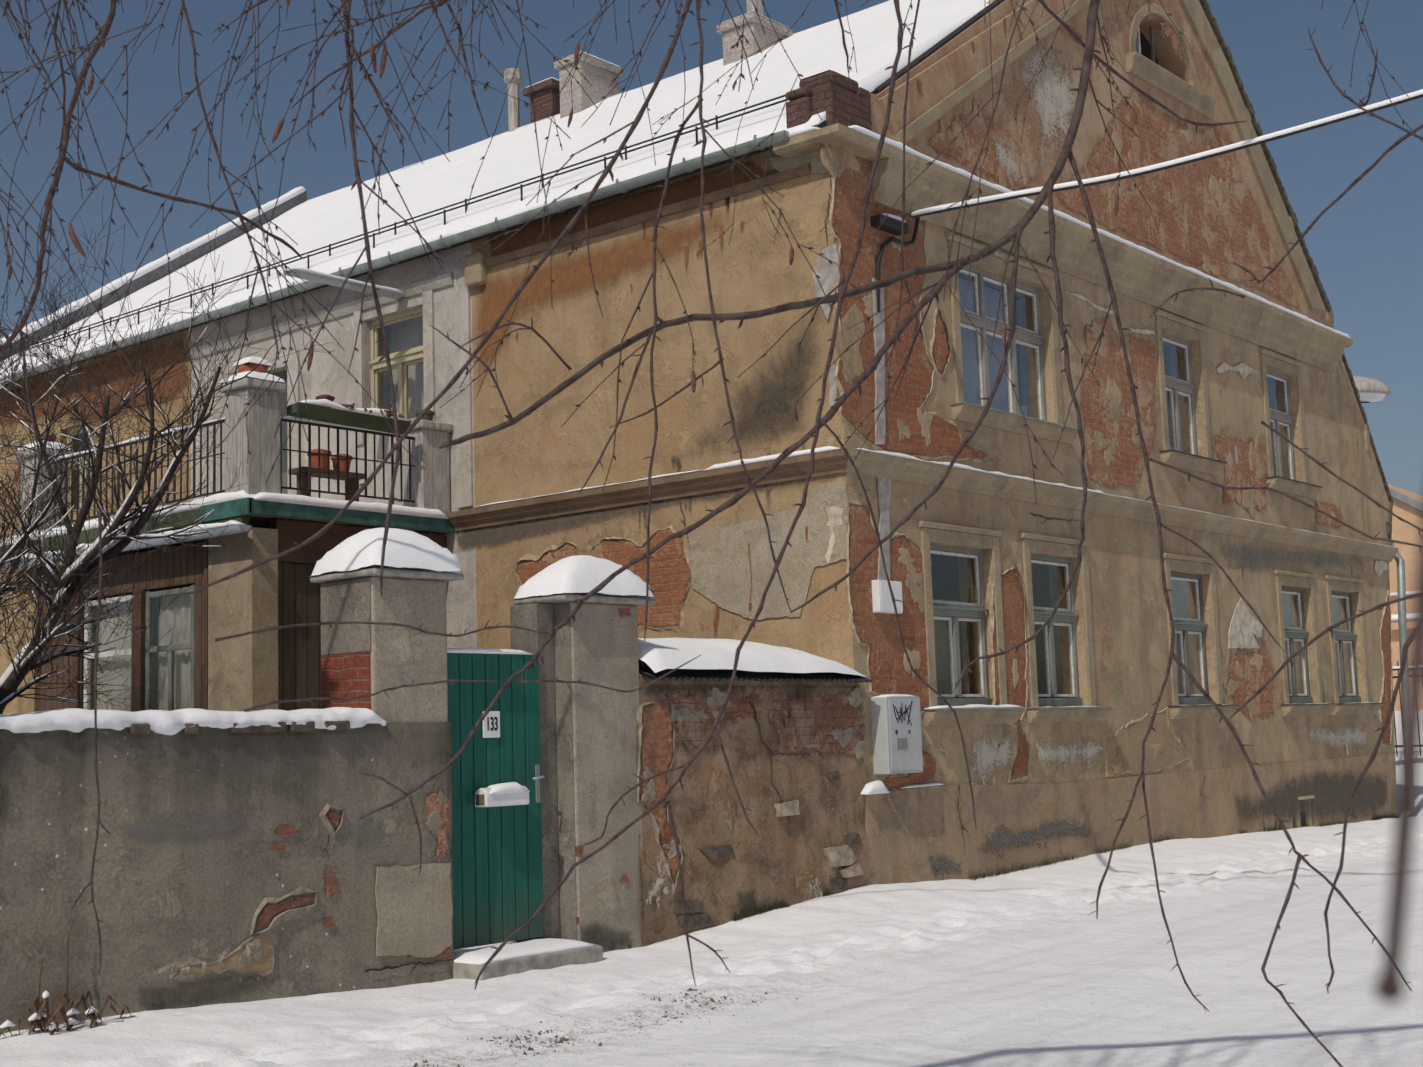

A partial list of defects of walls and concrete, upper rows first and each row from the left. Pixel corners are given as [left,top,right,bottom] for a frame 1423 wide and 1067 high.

spalling [820,143,995,463]
water stain [734,330,810,440]
spalling [1066,292,1158,492]
spalling [515,525,692,633]
spalling [637,500,937,928]
spalling [989,564,1030,783]
spalling [1223,598,1275,723]
spalling [424,790,451,860]
flaking render [168,863,338,983]